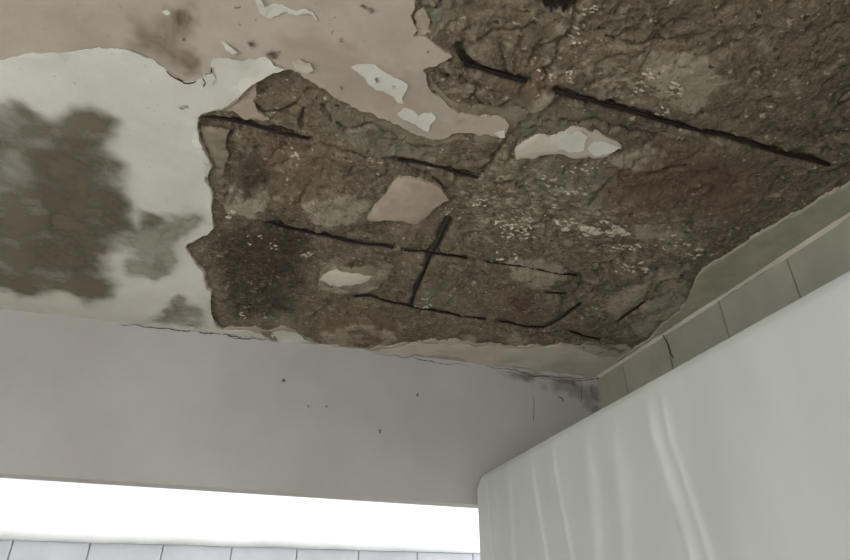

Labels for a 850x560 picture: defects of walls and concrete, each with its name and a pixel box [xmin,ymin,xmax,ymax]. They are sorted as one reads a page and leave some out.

damp [0,103,199,300]
spalling [0,0,850,354]
damp [157,295,199,326]
crack [120,324,275,342]